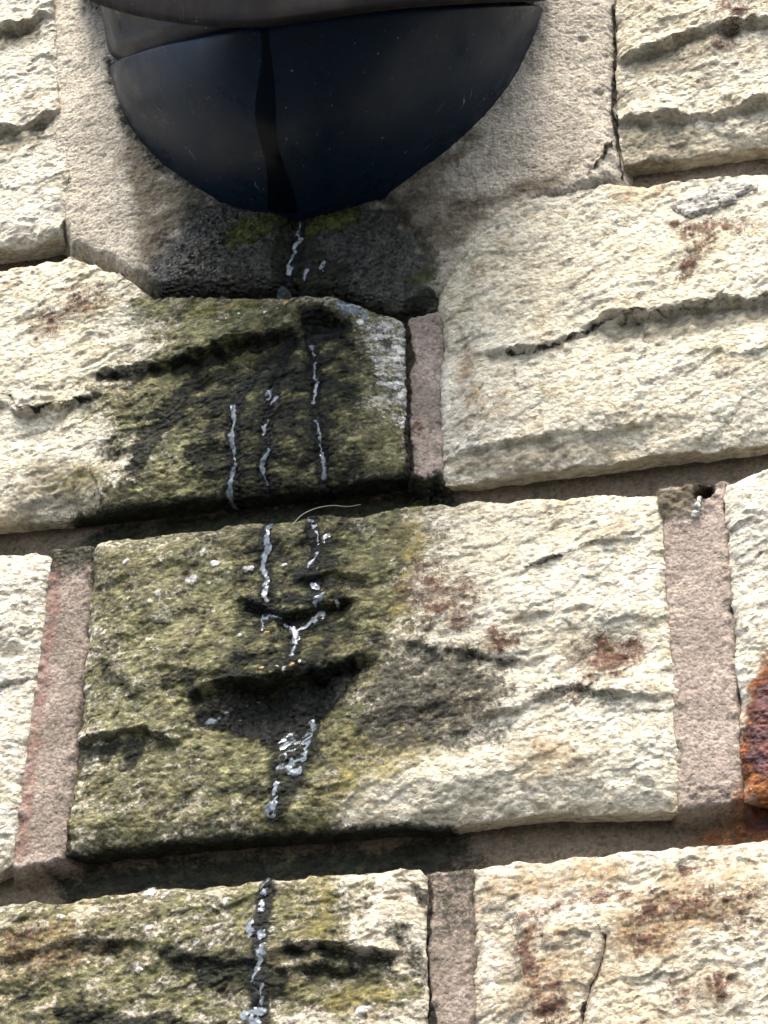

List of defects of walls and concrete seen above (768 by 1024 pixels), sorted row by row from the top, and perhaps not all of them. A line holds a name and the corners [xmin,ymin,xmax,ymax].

crack [588,4,624,180]
damp [244,515,330,673]
damp [204,656,359,827]
rust [696,657,768,846]
damp [239,878,277,1024]
crack [580,922,607,1023]